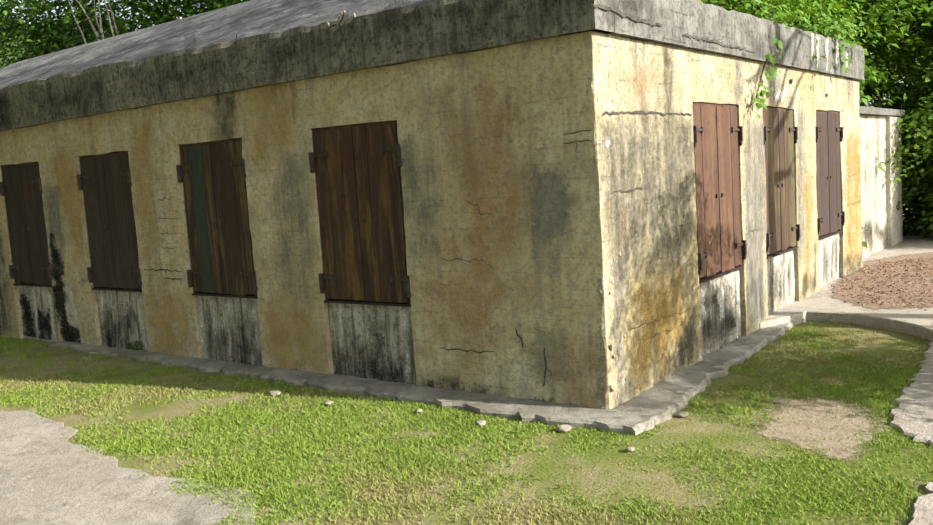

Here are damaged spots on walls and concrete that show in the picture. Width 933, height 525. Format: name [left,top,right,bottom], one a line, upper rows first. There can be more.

damp [606,120,693,272]
damp [18,159,81,343]
crack [442,346,495,354]
crack [515,328,551,386]
damp [632,273,693,382]